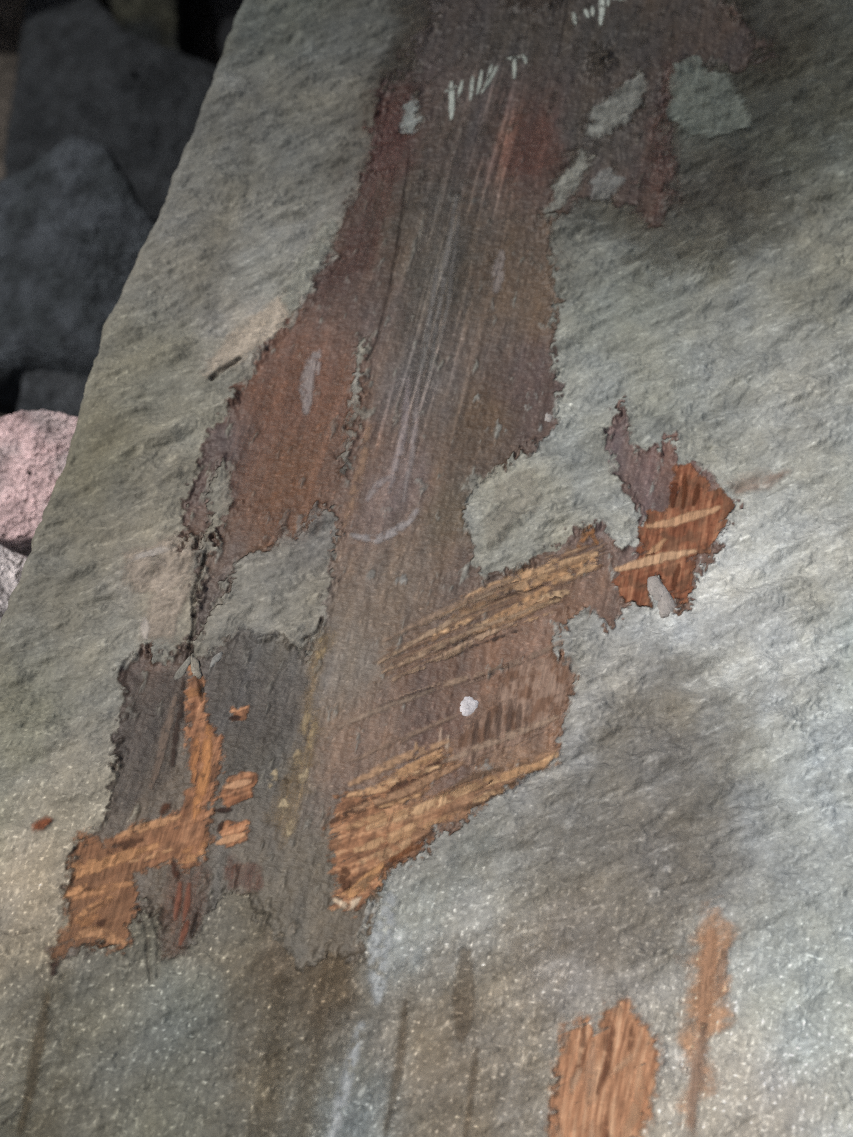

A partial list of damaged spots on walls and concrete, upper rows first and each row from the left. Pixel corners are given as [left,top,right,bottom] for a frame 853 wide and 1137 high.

peeling [45,937,109,961]
peeling [60,0,779,972]